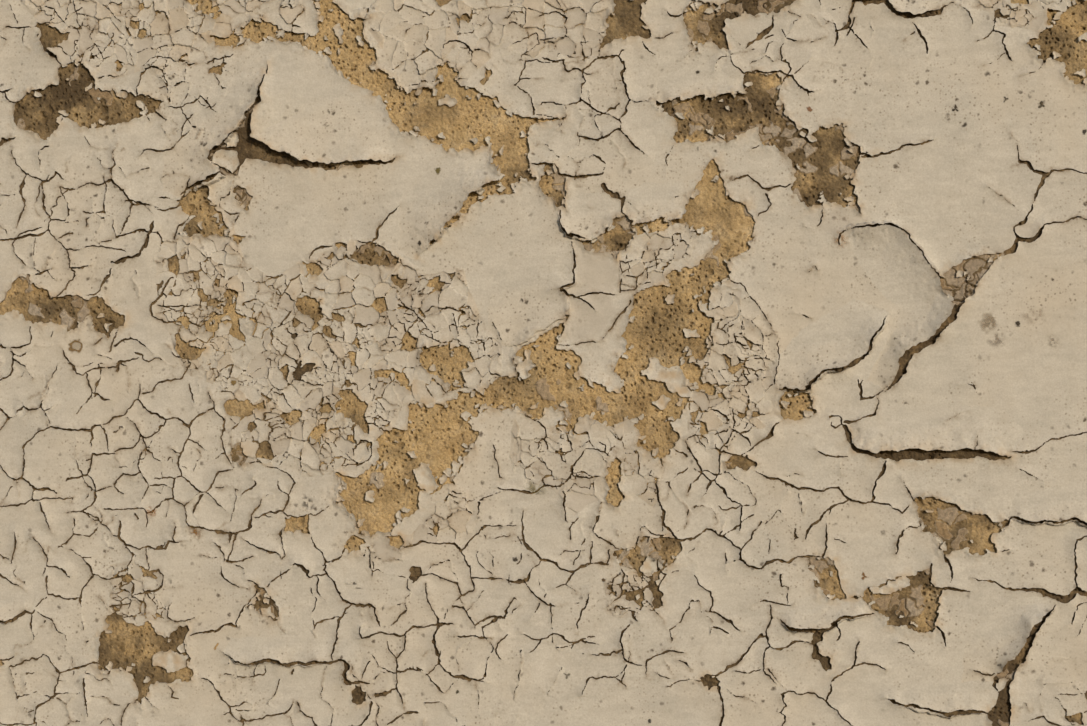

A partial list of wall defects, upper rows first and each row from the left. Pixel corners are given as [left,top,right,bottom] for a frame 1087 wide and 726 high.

peeling [13,62,164,140]
crack [1,0,306,177]
peeling [162,0,758,556]
crack [353,0,699,346]
peeling [655,0,1004,421]
crack [715,0,1067,96]
crack [988,145,1087,256]
crack [0,137,965,726]
peeling [849,402,1024,458]
peeling [98,612,194,704]
peeling [772,556,944,671]
crack [929,516,1087,676]